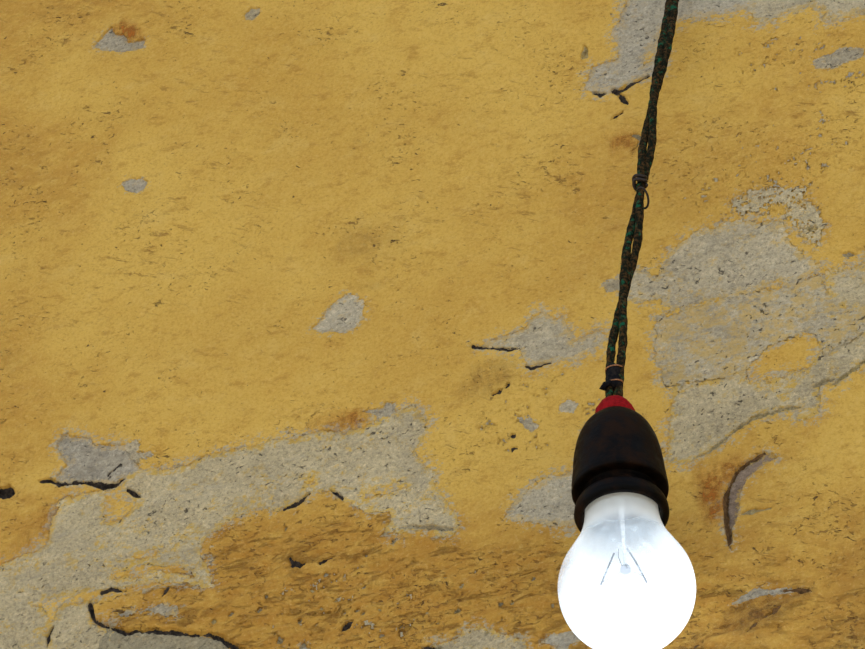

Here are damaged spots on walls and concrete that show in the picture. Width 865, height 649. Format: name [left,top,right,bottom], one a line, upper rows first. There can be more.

peeling [677,0,865,24]
peeling [95,28,145,52]
peeling [790,36,865,89]
peeling [313,293,364,334]
peeling [483,312,606,366]
crack [813,360,865,388]
crack [697,406,801,458]
peeling [505,471,575,527]
peeling [0,402,461,649]
crack [88,588,239,649]
peeling [432,625,528,649]
peeling [541,631,581,649]